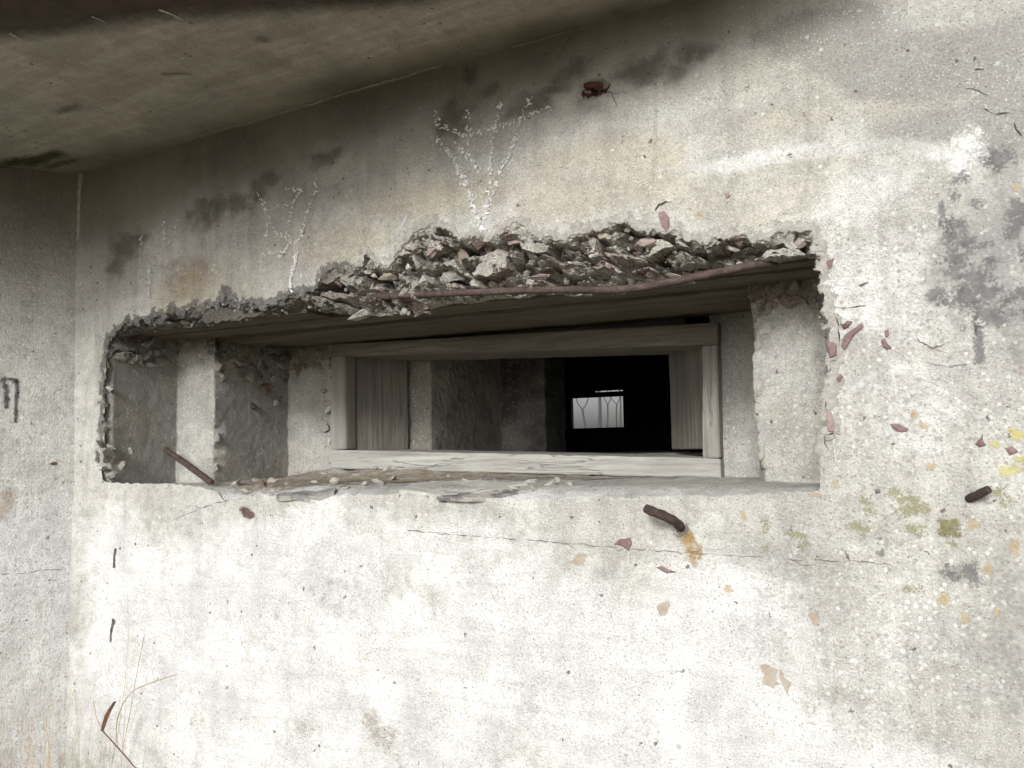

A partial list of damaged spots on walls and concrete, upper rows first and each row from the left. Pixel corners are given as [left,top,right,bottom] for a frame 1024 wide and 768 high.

spalling [94,211,864,479]
rust [163,447,214,486]
rust [675,524,702,564]
crack [790,558,889,566]